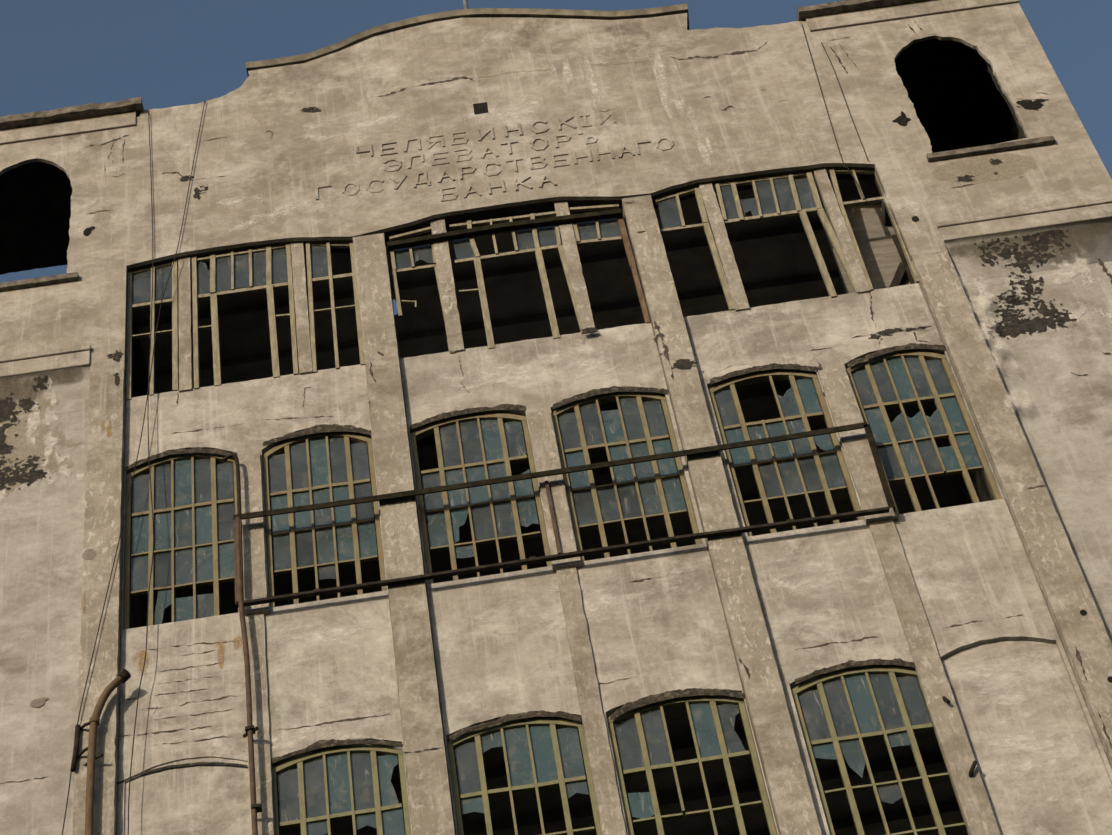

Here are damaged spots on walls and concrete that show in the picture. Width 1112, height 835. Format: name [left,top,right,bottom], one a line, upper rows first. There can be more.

spalling [974,229,1083,339]
flaking render [0,375,79,493]